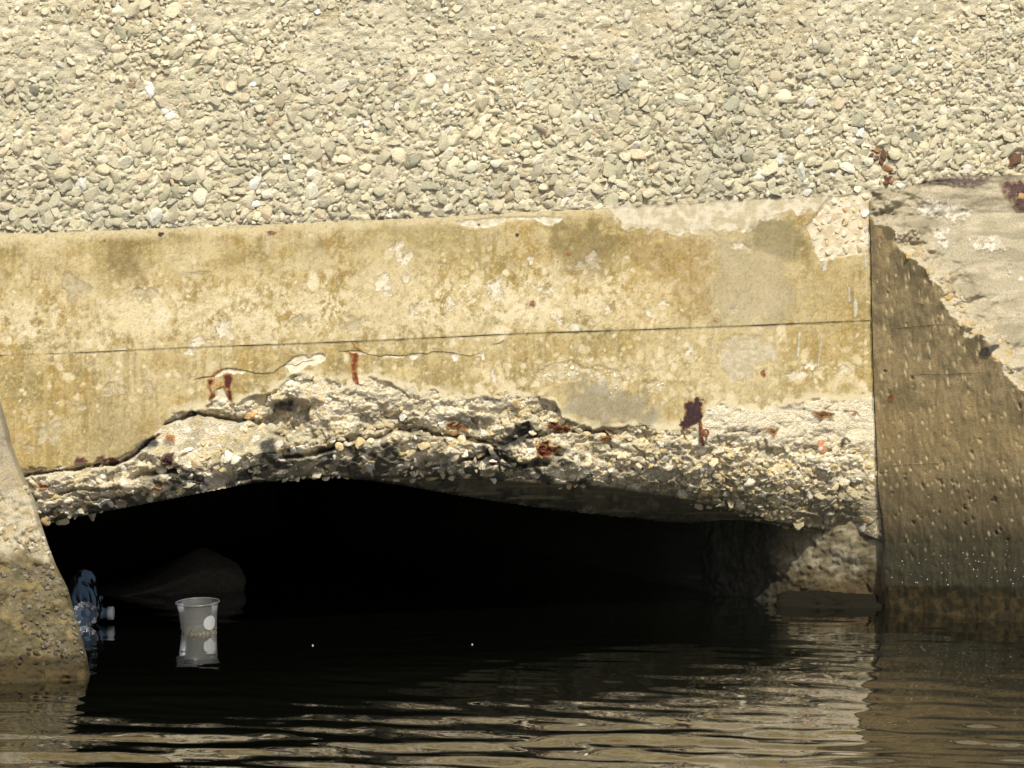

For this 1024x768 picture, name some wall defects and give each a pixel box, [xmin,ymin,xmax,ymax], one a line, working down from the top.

peeling [605,191,872,262]
crack [49,347,147,355]
crack [194,334,502,390]
rust [350,343,361,384]
hole [979,344,999,356]
rust [207,368,233,402]
rust [679,397,704,430]
spalling [0,351,883,667]